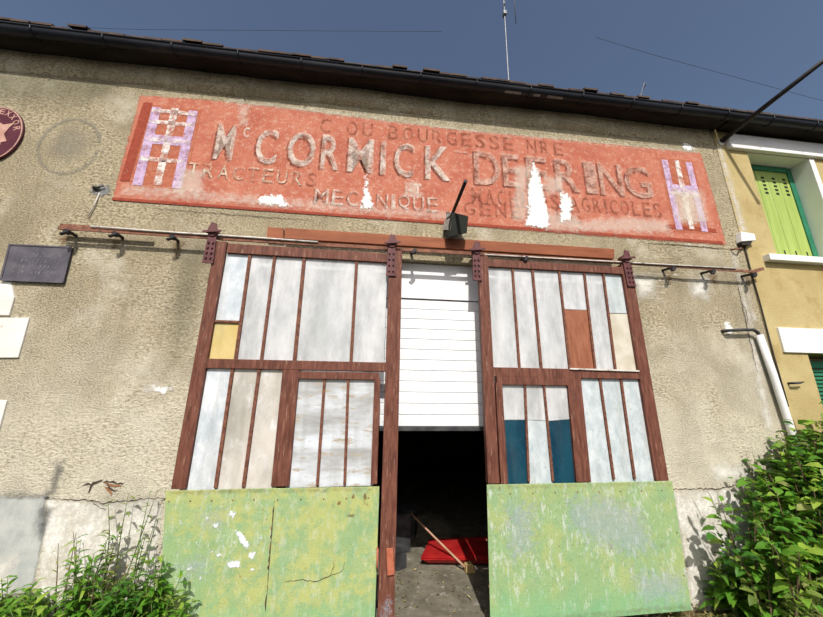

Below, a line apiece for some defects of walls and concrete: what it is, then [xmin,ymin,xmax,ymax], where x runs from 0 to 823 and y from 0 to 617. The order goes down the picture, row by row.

peeling [258,194,289,207]
peeling [360,175,374,211]
peeling [522,162,551,230]
peeling [559,192,573,222]
crack [48,480,159,510]